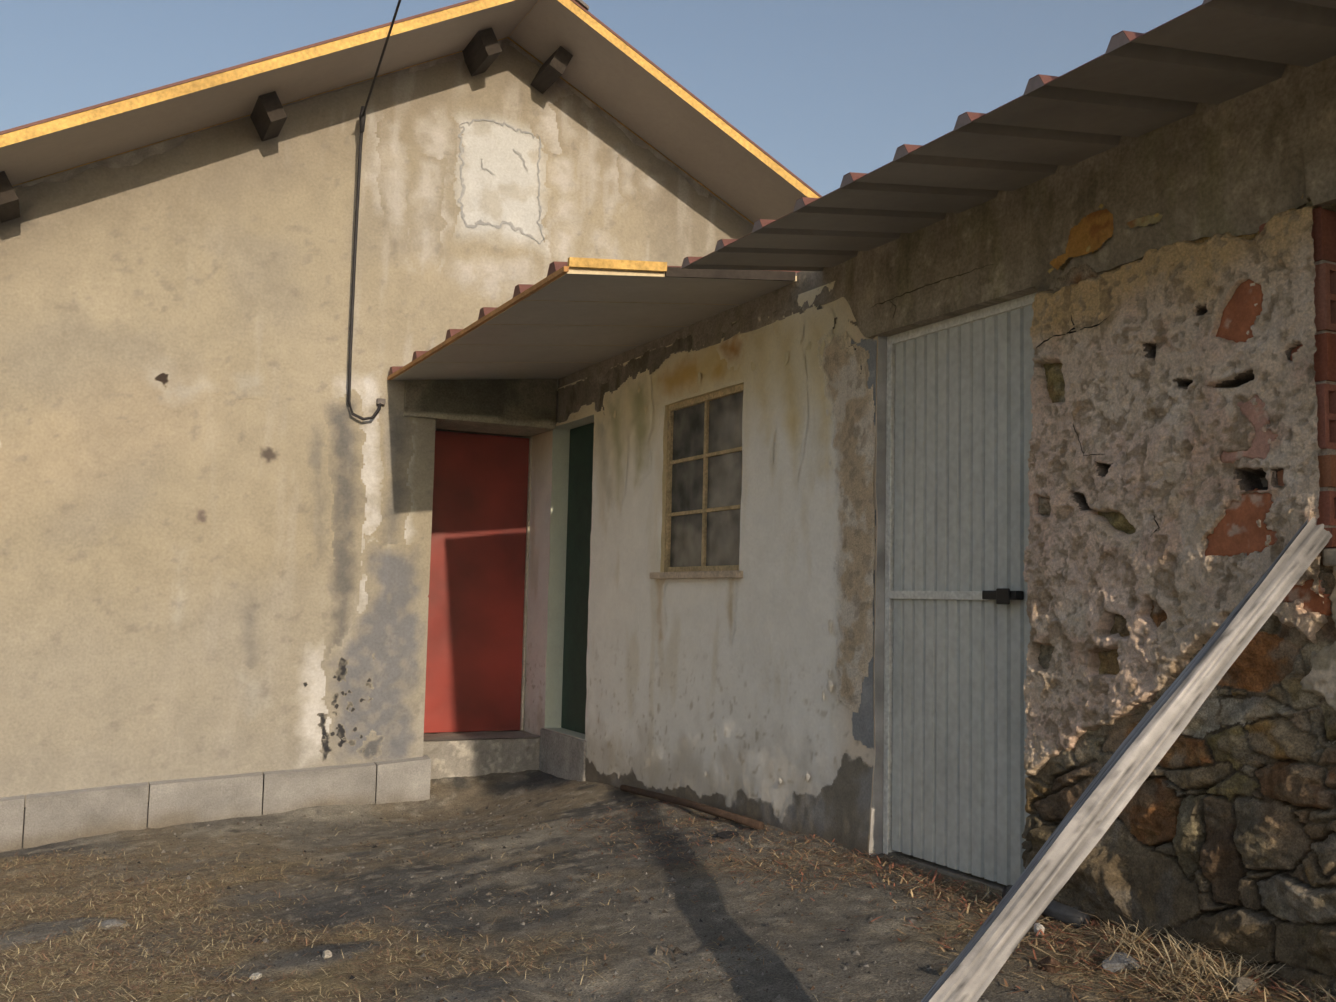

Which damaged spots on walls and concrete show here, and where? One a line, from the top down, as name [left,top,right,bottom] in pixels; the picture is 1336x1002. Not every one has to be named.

spalling [1048,204,1163,274]
spalling [1216,279,1263,343]
damp [139,353,272,412]
peeling [556,335,704,424]
spalling [1203,488,1278,557]
damp [230,367,427,769]
spalling [585,304,877,856]
spalling [1283,578,1332,616]